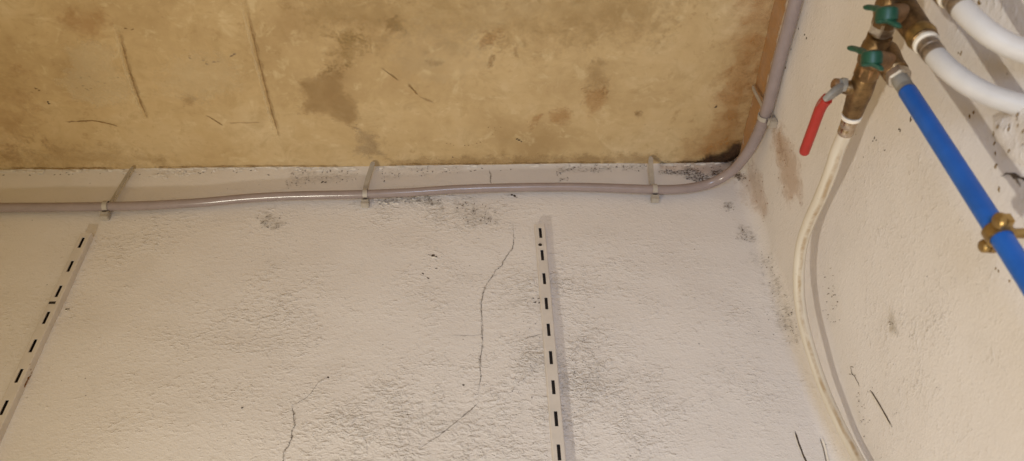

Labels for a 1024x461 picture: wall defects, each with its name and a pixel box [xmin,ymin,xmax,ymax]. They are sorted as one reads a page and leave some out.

water stain [664,144,746,182]